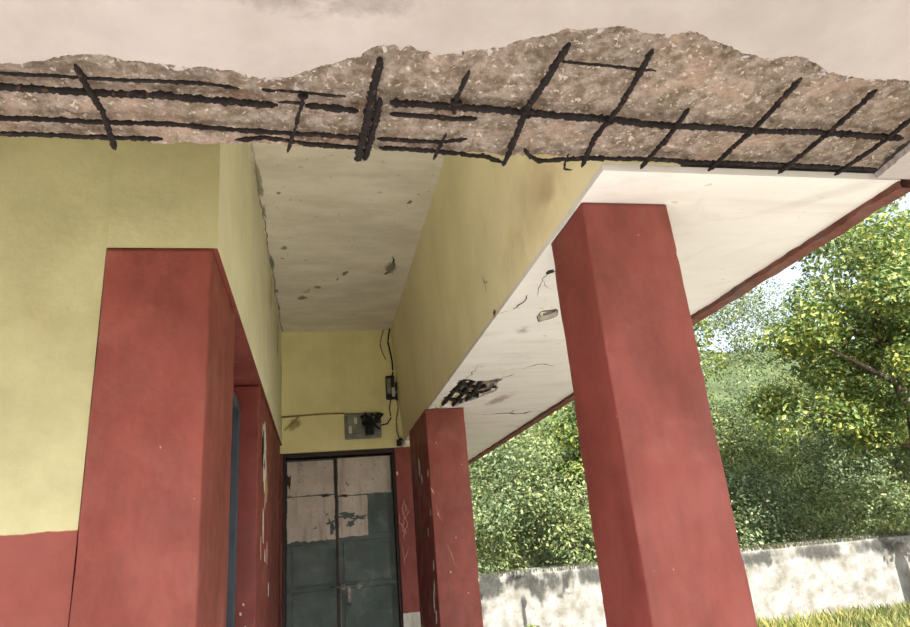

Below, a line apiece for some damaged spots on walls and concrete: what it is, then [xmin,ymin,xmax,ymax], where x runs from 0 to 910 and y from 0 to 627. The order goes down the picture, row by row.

spalling [0,26,910,176]
crack [502,269,555,313]
spalling [435,370,514,408]